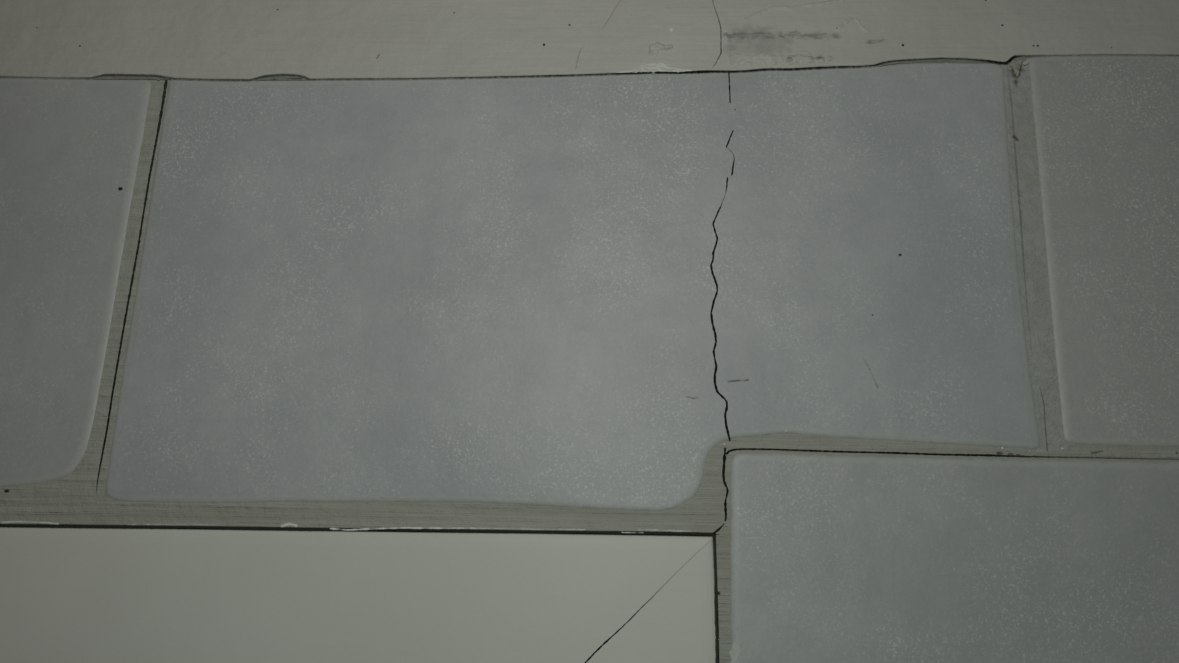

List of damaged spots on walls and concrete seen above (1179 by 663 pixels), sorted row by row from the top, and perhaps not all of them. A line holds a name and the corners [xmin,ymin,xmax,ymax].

crack [0,130,1054,663]